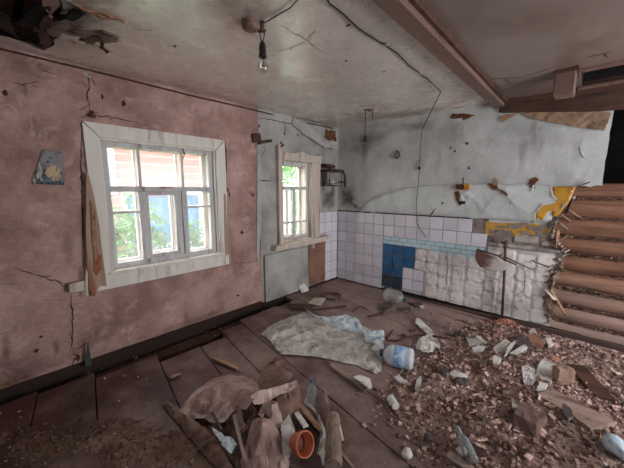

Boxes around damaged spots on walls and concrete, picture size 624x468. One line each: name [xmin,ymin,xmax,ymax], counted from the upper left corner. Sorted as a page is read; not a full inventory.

crack [80,74,143,241]
crack [16,268,87,366]
crack [422,251,459,299]
peeling [378,196,576,324]